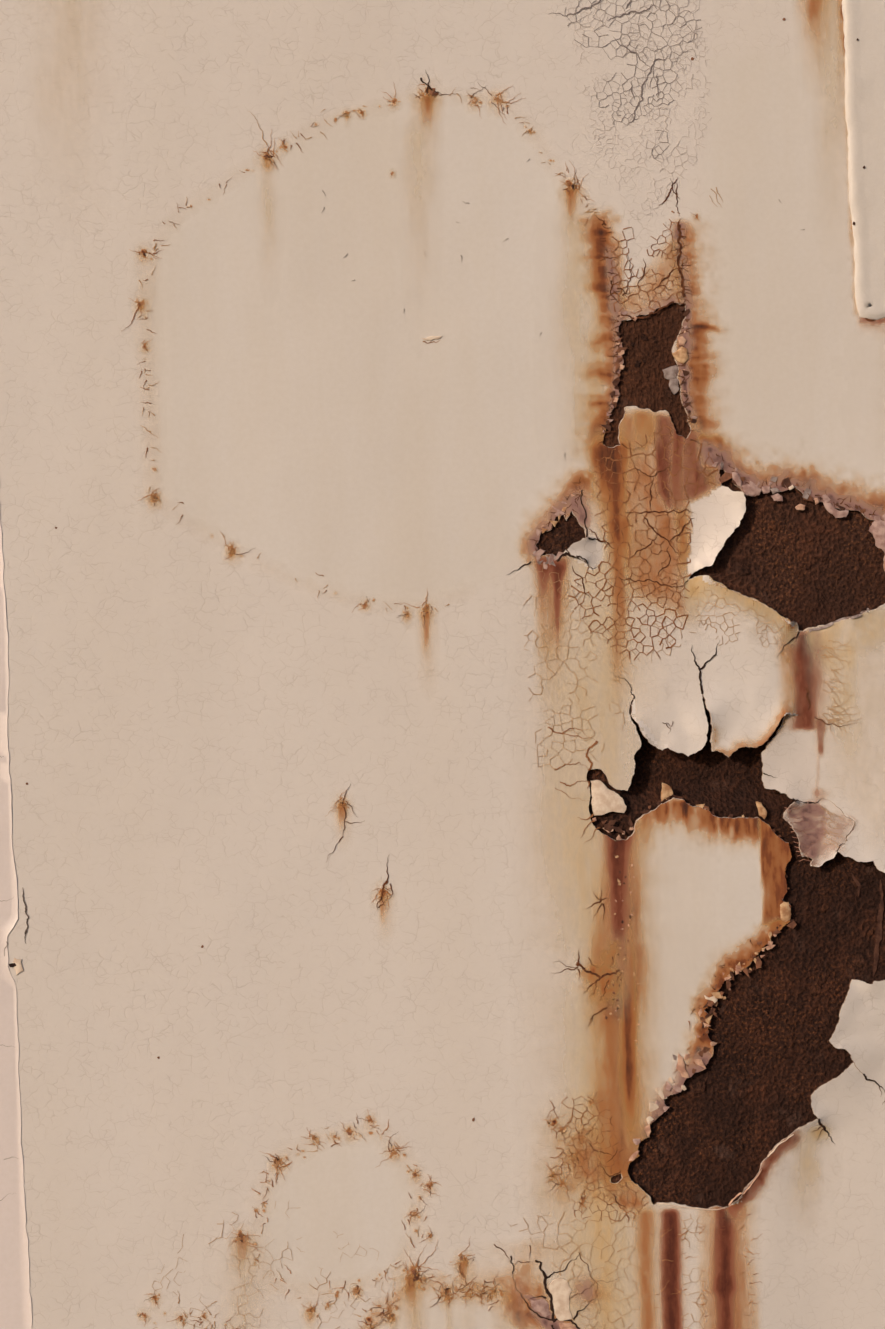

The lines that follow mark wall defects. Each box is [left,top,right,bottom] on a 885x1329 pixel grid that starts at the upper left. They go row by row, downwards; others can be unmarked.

corrosion [251,113,287,169]
corrosion [414,73,525,120]
peeling [599,220,701,450]
peeling [506,490,607,575]
corrosion [521,163,885,756]
corrosion [397,588,432,643]
corrosion [326,784,359,862]
corrosion [372,858,393,912]
peeling [586,462,885,1282]
corrosion [544,789,841,1329]
corrosion [350,1169,502,1323]
crack [513,1092,762,1329]